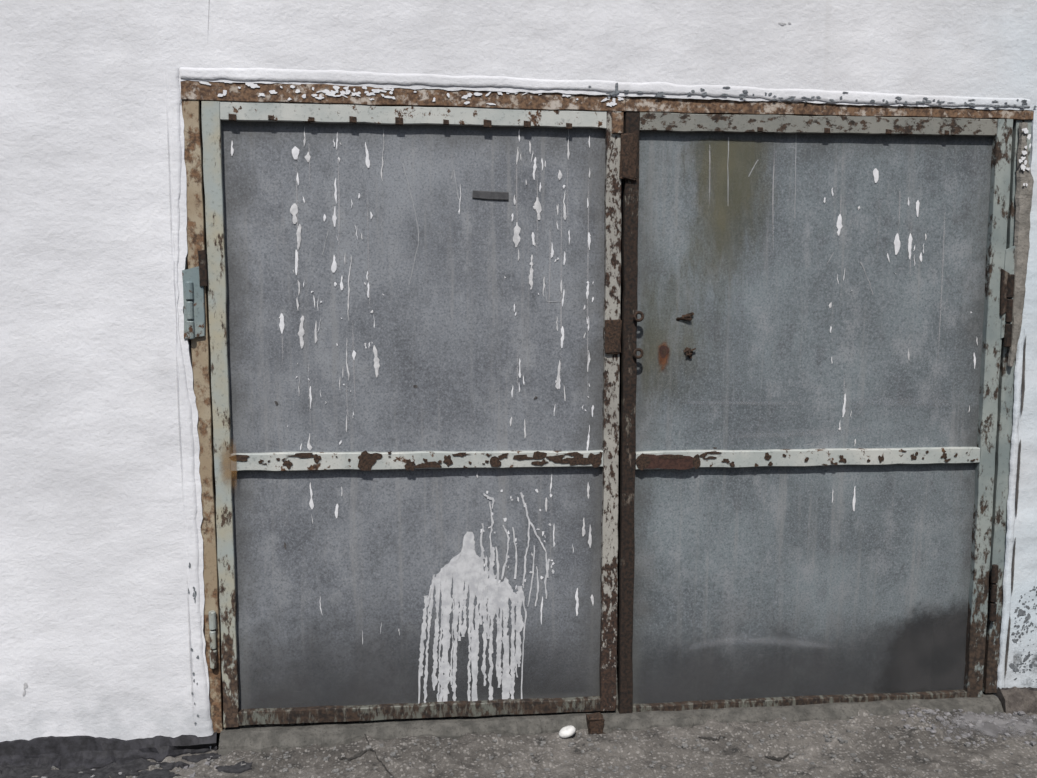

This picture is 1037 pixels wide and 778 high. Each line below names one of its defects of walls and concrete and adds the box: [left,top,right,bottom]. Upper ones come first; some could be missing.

peeling [433,91,541,105]
peeling [601,83,667,107]
peeling [721,86,1037,109]
corrosion [659,344,669,369]
corrosion [229,453,321,469]
corrosion [336,450,392,471]
corrosion [404,451,603,471]
corrosion [636,447,735,470]